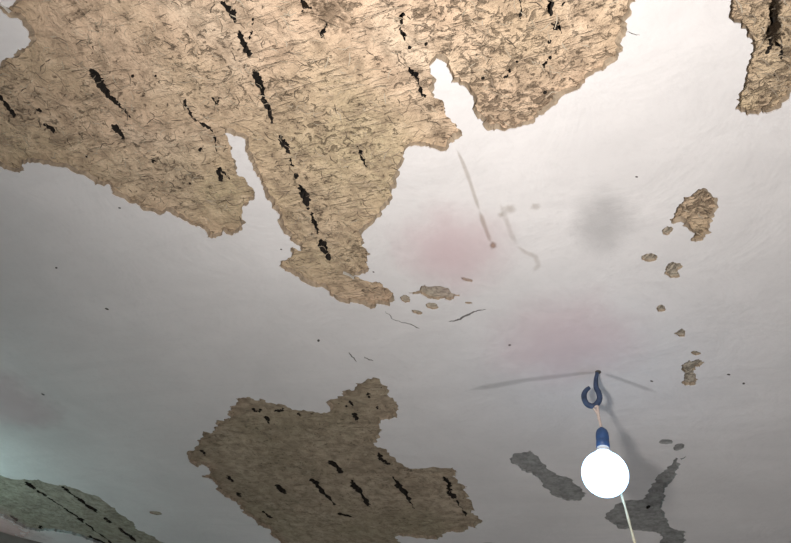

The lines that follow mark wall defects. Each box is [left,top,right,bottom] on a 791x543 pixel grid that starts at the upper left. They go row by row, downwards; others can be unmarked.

flaking render [729,0,791,115]
crack [765,6,784,76]
crack [89,68,131,140]
crack [220,0,331,261]
flaking render [0,0,635,315]
flaking render [662,188,719,242]
flaking render [681,351,704,386]
crack [24,482,136,543]
flaking render [0,475,163,543]
flaking render [187,377,482,543]
crack [309,460,371,517]
crack [377,453,415,509]